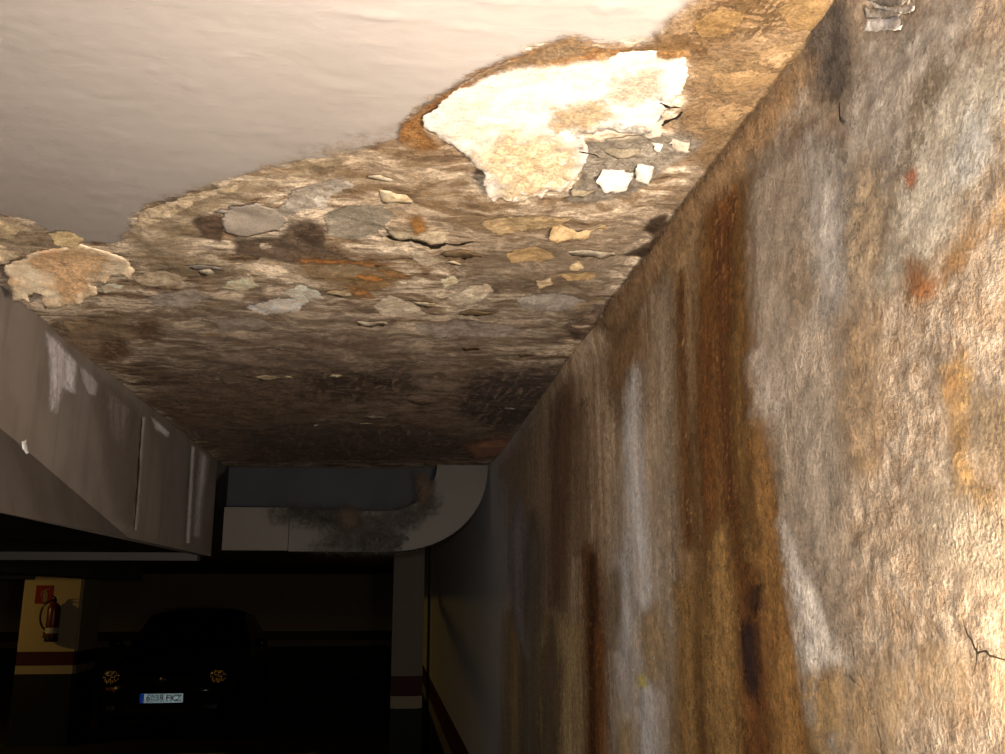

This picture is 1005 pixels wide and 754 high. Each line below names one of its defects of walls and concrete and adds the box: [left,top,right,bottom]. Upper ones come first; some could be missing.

peeling [862,0,915,32]
peeling [0,0,711,468]
water stain [140,350,591,754]
corrosion [581,541,612,754]
corrosion [606,174,819,754]
water stain [596,0,1005,754]
crack [840,609,869,701]
crack [963,620,1005,675]